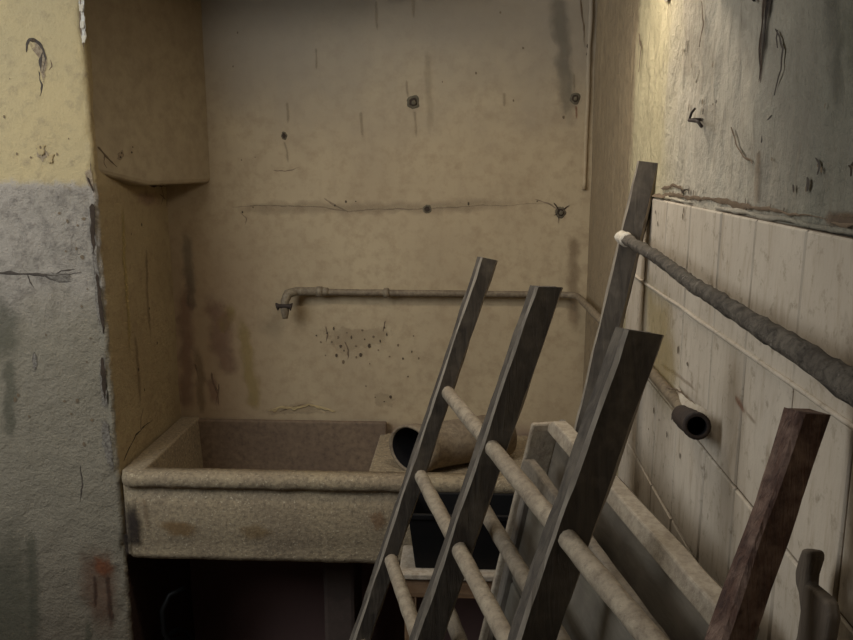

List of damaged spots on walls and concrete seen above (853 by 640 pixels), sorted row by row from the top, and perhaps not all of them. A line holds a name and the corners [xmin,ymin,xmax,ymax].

crack [26,38,52,95]
crack [755,0,784,95]
crack [239,198,557,224]
crack [0,269,80,286]